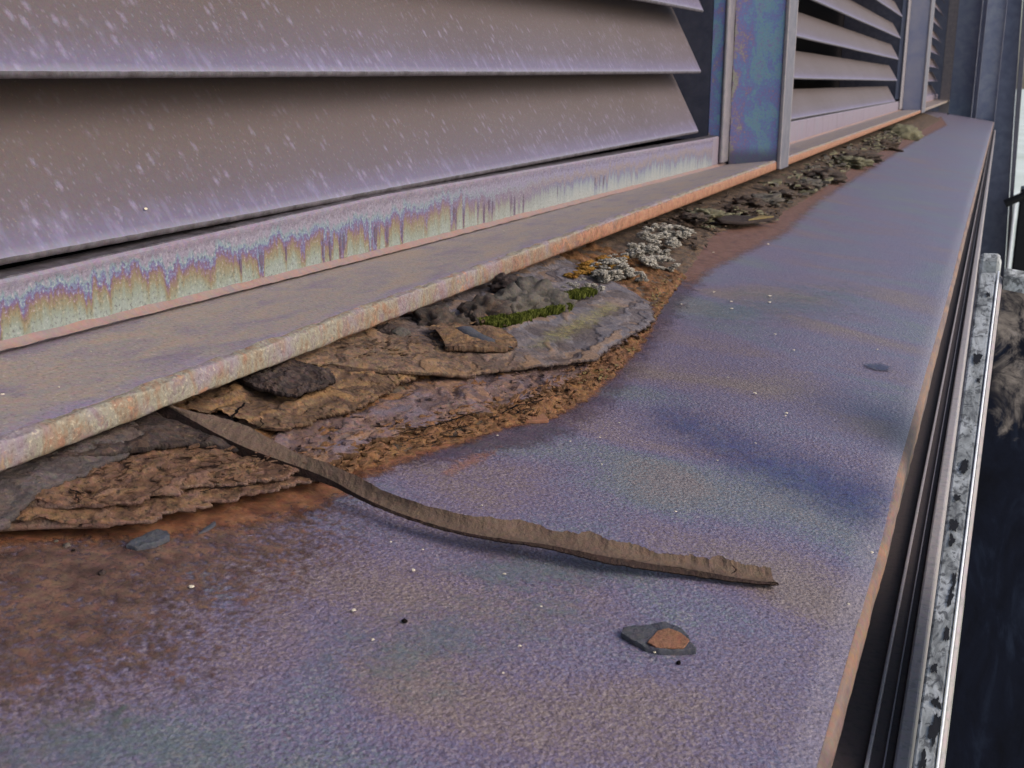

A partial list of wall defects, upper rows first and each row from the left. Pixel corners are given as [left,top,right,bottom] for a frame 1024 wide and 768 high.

water stain [0,141,713,341]
peeling [156,405,779,586]
corrosion [0,110,946,750]